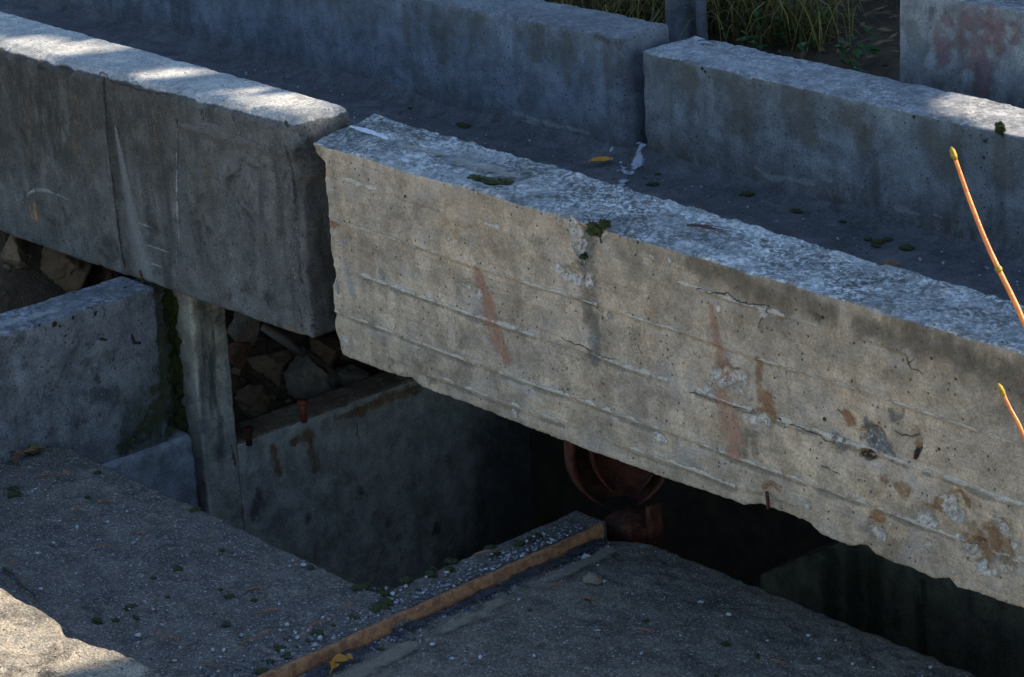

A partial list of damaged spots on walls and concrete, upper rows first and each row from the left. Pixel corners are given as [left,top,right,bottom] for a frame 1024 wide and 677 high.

spalling [553,215,608,290]
crack [696,288,769,327]
rust [756,357,776,423]
rust [842,409,855,426]
spalling [861,416,895,461]
spalling [881,475,910,497]
spalling [915,492,1020,577]